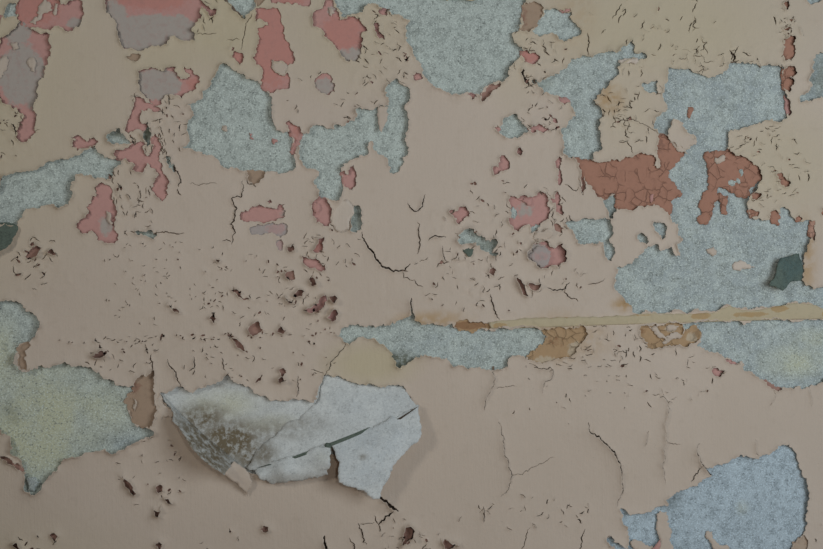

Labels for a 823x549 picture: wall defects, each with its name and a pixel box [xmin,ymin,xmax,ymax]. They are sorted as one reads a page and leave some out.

peeling [0,0,823,377]
peeling [0,300,422,499]
peeling [691,319,823,392]
crack [349,497,398,549]
peeling [607,445,816,549]